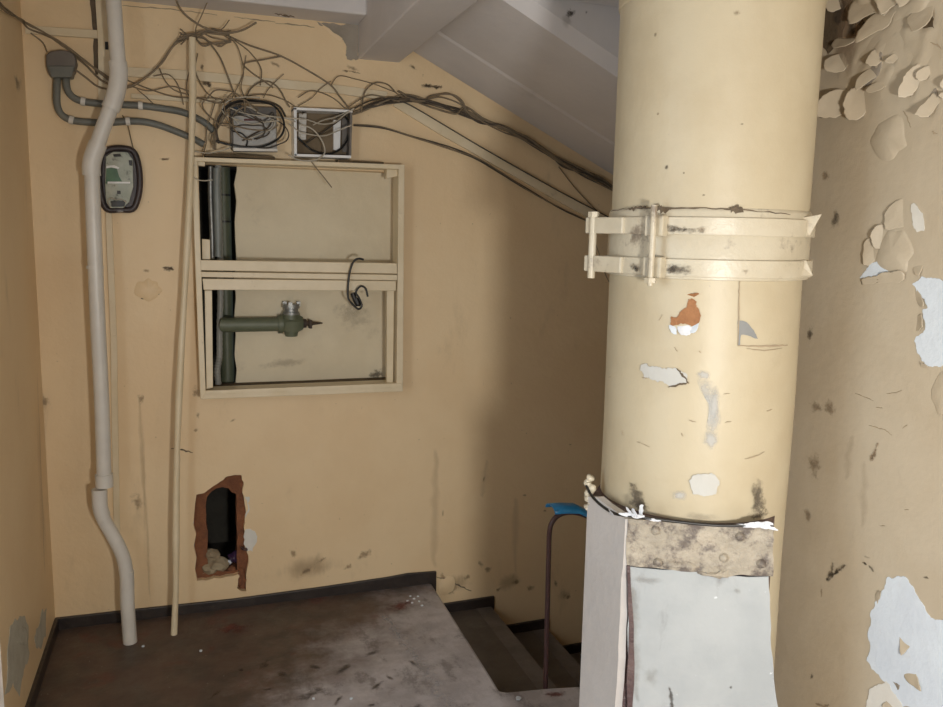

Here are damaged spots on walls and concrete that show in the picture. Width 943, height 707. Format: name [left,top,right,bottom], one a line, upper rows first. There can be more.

spalling [316,21,358,60]
peeling [823,0,934,73]
peeling [817,49,898,120]
peeling [669,293,701,336]
peeling [860,198,943,369]
peeling [640,363,689,387]
peeling [676,473,720,498]
spalling [194,475,257,589]
peeling [5,608,47,697]
peeling [866,576,943,707]